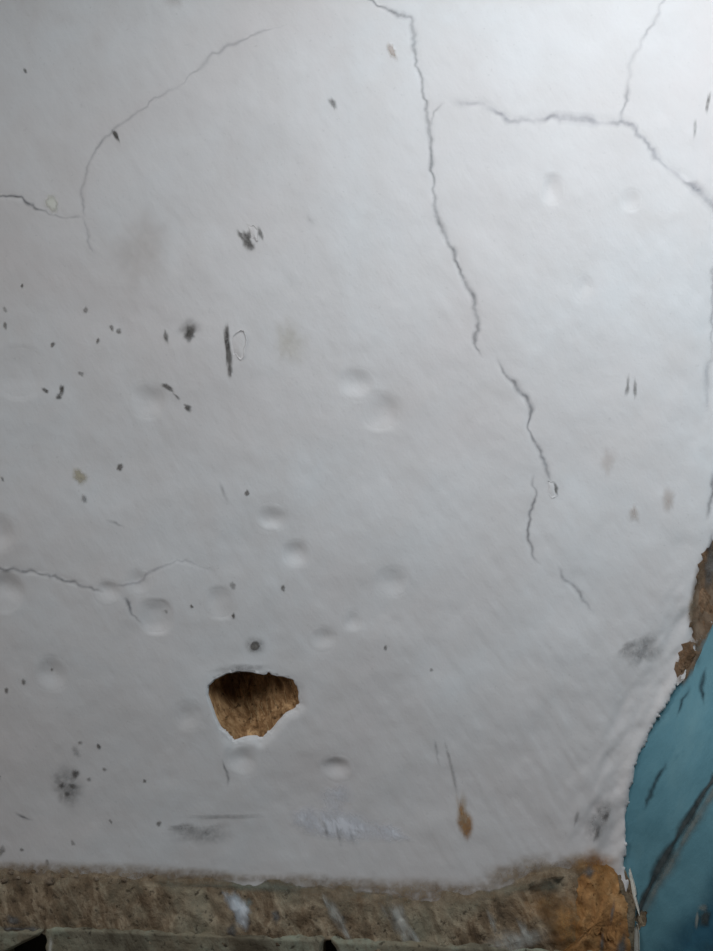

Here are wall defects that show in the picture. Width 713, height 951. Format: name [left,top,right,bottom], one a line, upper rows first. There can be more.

spalling [674,540,713,685]
spalling [204,670,301,744]
spalling [559,856,640,951]